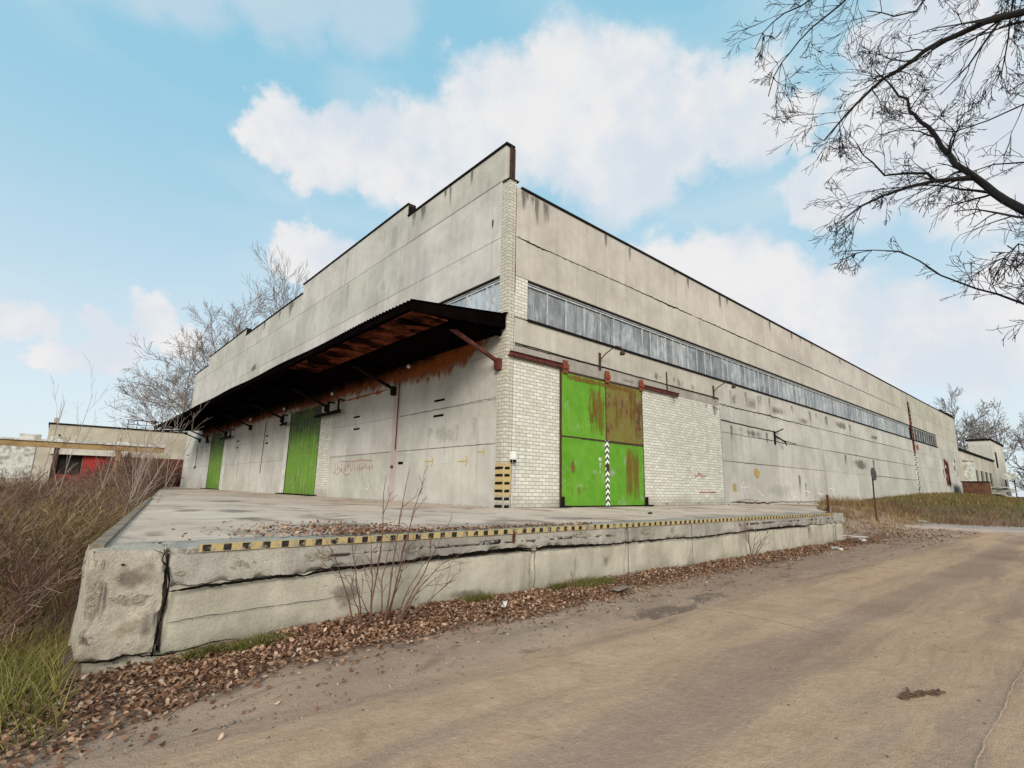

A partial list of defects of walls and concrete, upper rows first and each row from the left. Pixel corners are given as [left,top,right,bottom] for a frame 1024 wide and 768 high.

corrosion [203,339,487,435]
corrosion [567,375,636,435]
corrosion [907,402,919,454]
corrosion [627,450,639,495]
crack [72,377,913,664]